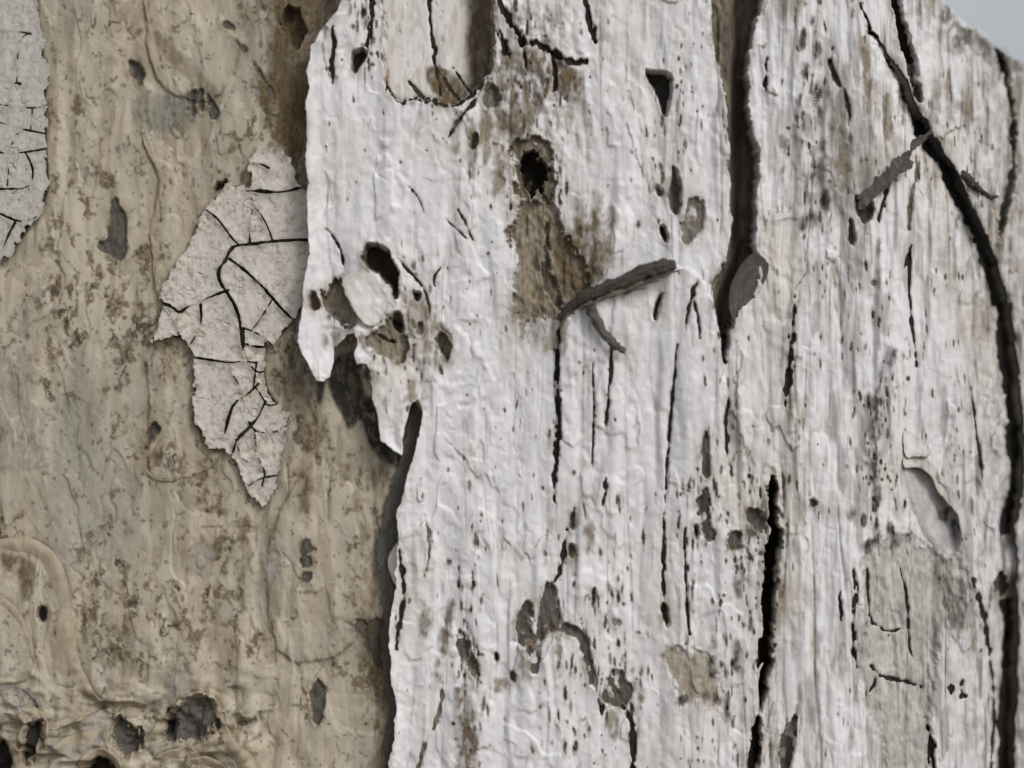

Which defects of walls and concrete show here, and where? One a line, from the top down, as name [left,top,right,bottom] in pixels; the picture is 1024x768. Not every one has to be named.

peeling [0,0,50,262]
crack [385,0,484,137]
crack [497,0,597,92]
peeling [97,198,127,261]
peeling [150,144,310,507]
crack [551,320,562,503]
spalling [513,152,680,354]
crack [877,160,920,367]
spalling [135,691,258,768]
spalling [516,582,633,707]
crack [838,568,922,692]
crack [971,578,996,768]